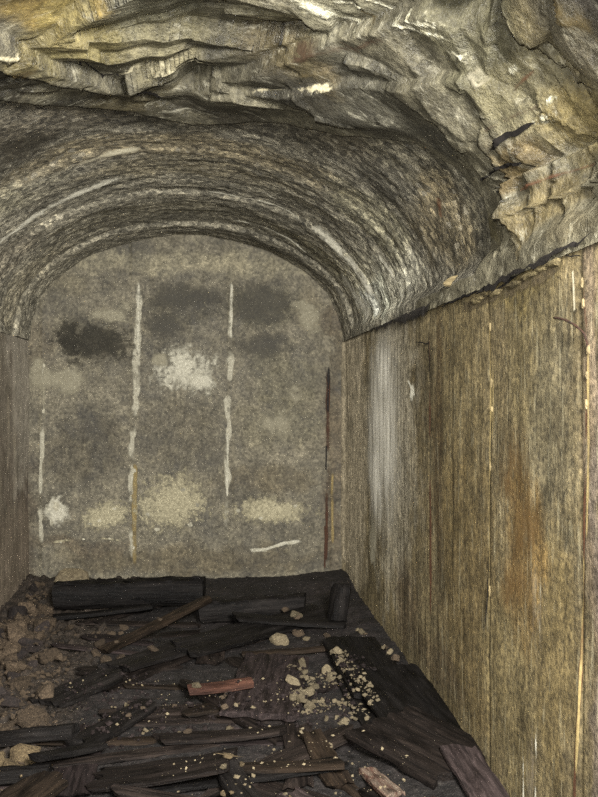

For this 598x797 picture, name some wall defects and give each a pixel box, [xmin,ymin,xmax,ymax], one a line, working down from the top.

crack [480,122,536,181]
leakage [29,283,235,416]
leakage [227,284,320,337]
leakage [128,426,137,562]
leakage [223,395,232,523]
rust [324,368,334,568]
leakage [368,347,397,567]
rust [573,354,590,797]